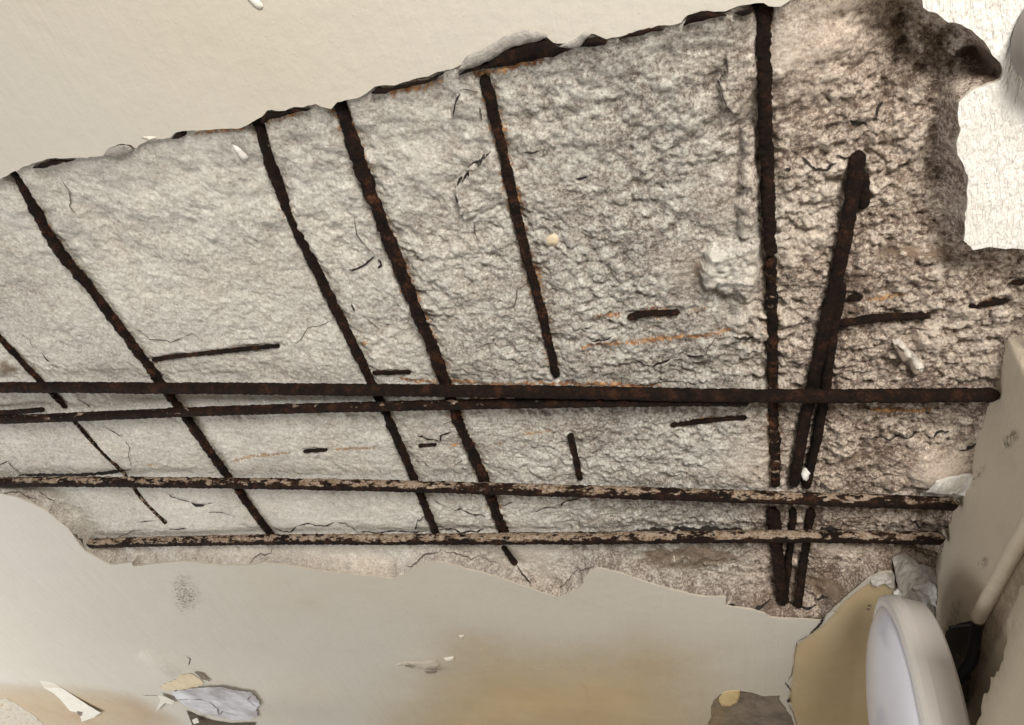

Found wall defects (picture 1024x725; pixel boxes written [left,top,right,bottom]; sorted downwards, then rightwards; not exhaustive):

spalling [0,0,1024,389]
corrosion [546,234,559,247]
corrosion [581,327,734,349]
corrosion [393,377,661,399]
spalling [0,381,1000,619]
crack [117,494,767,584]
crack [555,561,596,598]